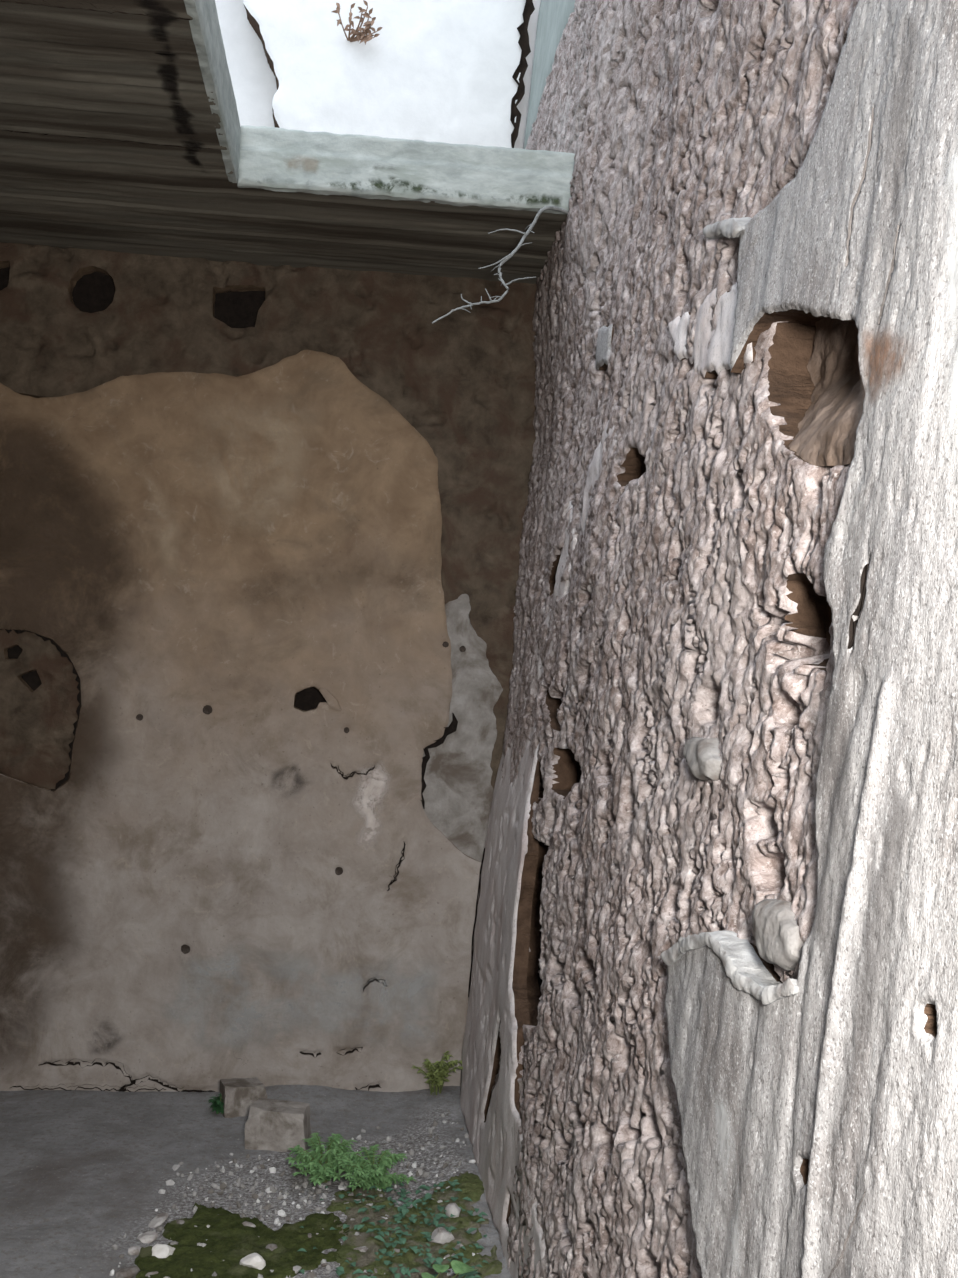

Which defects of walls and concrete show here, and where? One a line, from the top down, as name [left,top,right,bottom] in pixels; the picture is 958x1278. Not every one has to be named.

damp [142,0,202,165]
crack [845,108,874,266]
crack [878,225,900,324]
spalling [0,243,537,862]
spalling [503,0,865,1278]
crack [848,564,869,649]
crack [331,764,375,780]
crack [387,841,406,891]
peeling [460,722,541,1278]
crack [10,1058,215,1092]
crack [828,1191,866,1278]